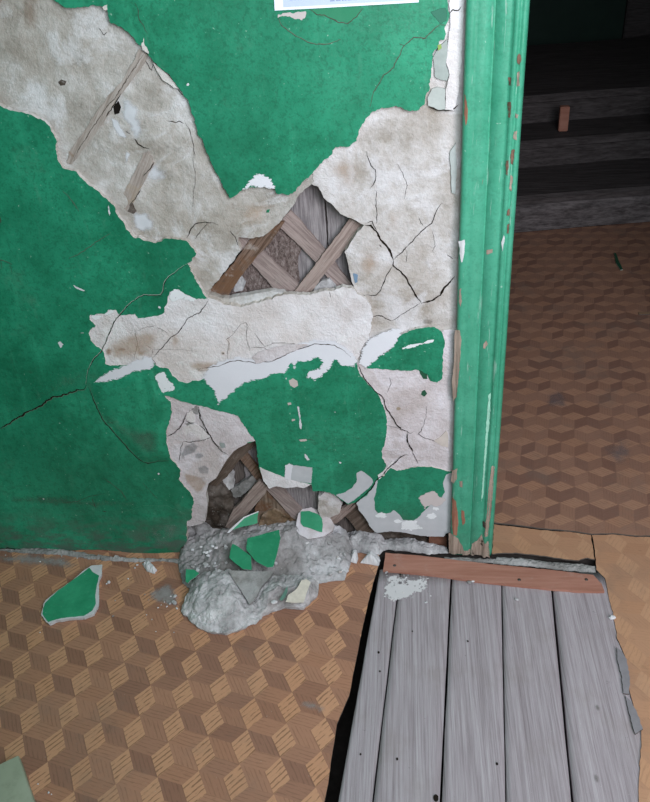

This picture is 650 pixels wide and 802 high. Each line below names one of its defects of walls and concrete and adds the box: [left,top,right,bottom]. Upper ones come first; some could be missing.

crack [370,24,446,106]
crack [2,263,188,464]
crack [152,301,208,364]
flaking render [0,0,495,558]
crack [365,204,454,321]